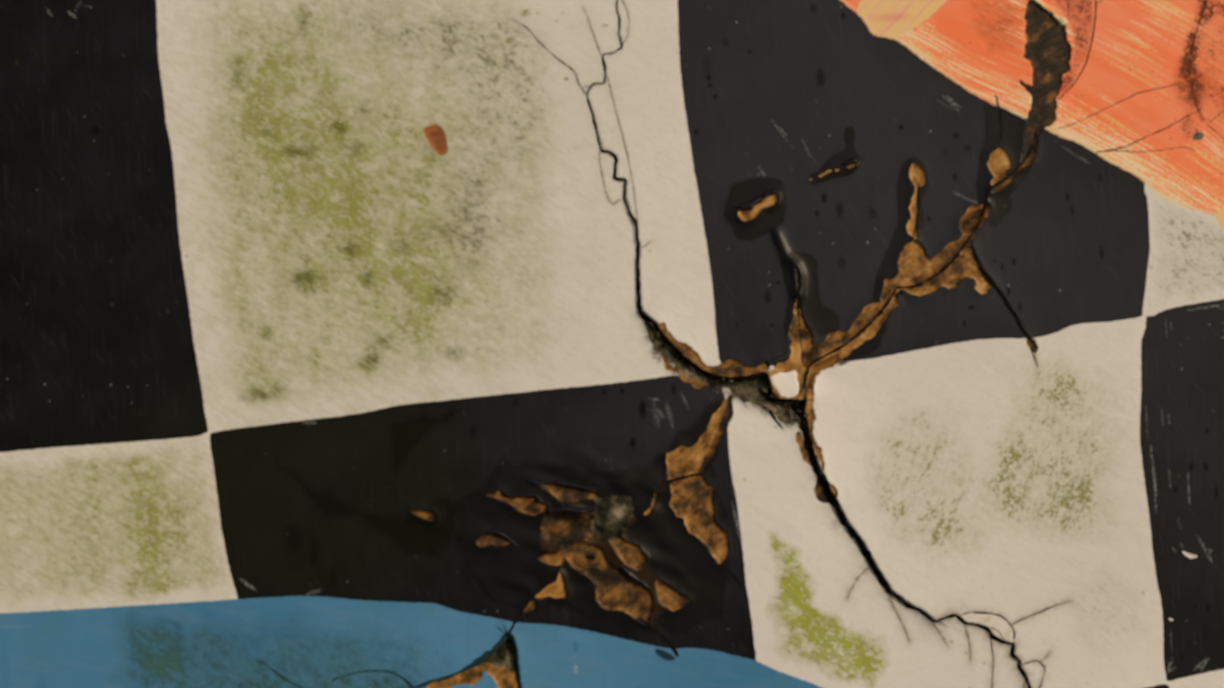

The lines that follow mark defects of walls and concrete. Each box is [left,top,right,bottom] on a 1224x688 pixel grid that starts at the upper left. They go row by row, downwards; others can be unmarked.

peeling [487,0,1072,623]
crack [513,0,1224,688]
peeling [477,535,512,547]
crack [259,660,303,688]
crack [332,565,560,688]
peeling [427,633,518,688]